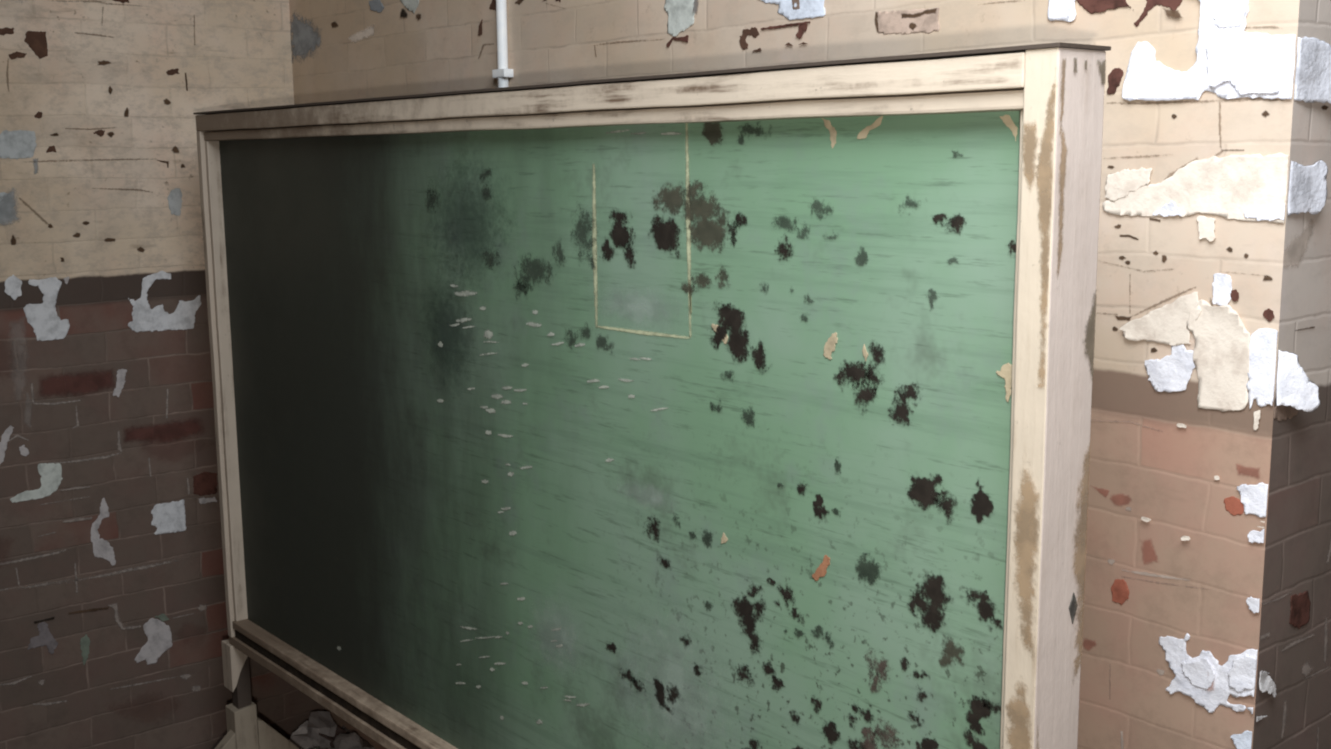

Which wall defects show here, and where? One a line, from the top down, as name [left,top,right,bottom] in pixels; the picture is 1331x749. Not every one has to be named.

peeling [478,0,496,36]
peeling [664,0,698,48]
peeling [739,0,825,52]
peeling [1048,0,1331,118]
peeling [1102,150,1328,267]
peeling [5,257,70,341]
peeling [128,271,201,332]
peeling [1113,273,1320,430]
peeling [0,389,201,593]
peeling [27,603,207,691]
peeling [1157,633,1286,749]